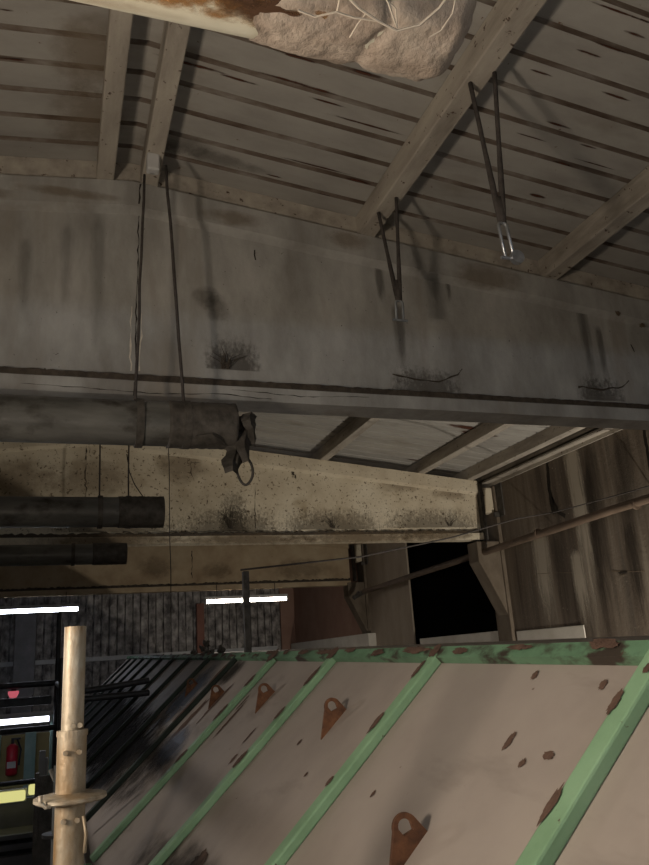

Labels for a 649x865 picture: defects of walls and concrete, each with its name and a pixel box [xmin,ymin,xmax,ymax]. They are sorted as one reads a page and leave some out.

corrosion [157,0,302,21]